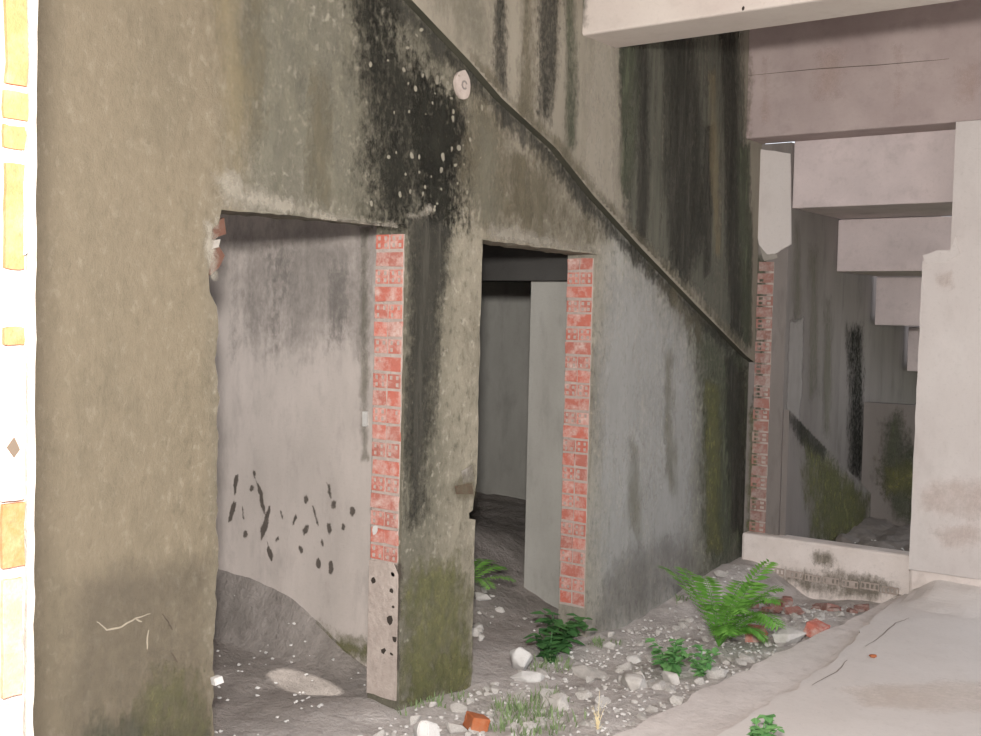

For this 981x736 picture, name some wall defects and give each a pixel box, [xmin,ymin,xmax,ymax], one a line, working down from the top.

damp [493,0,507,91]
damp [519,0,585,146]
damp [344,0,481,531]
damp [619,31,766,567]
spalling [228,475,244,522]
spalling [250,471,345,561]
damp [602,287,691,577]